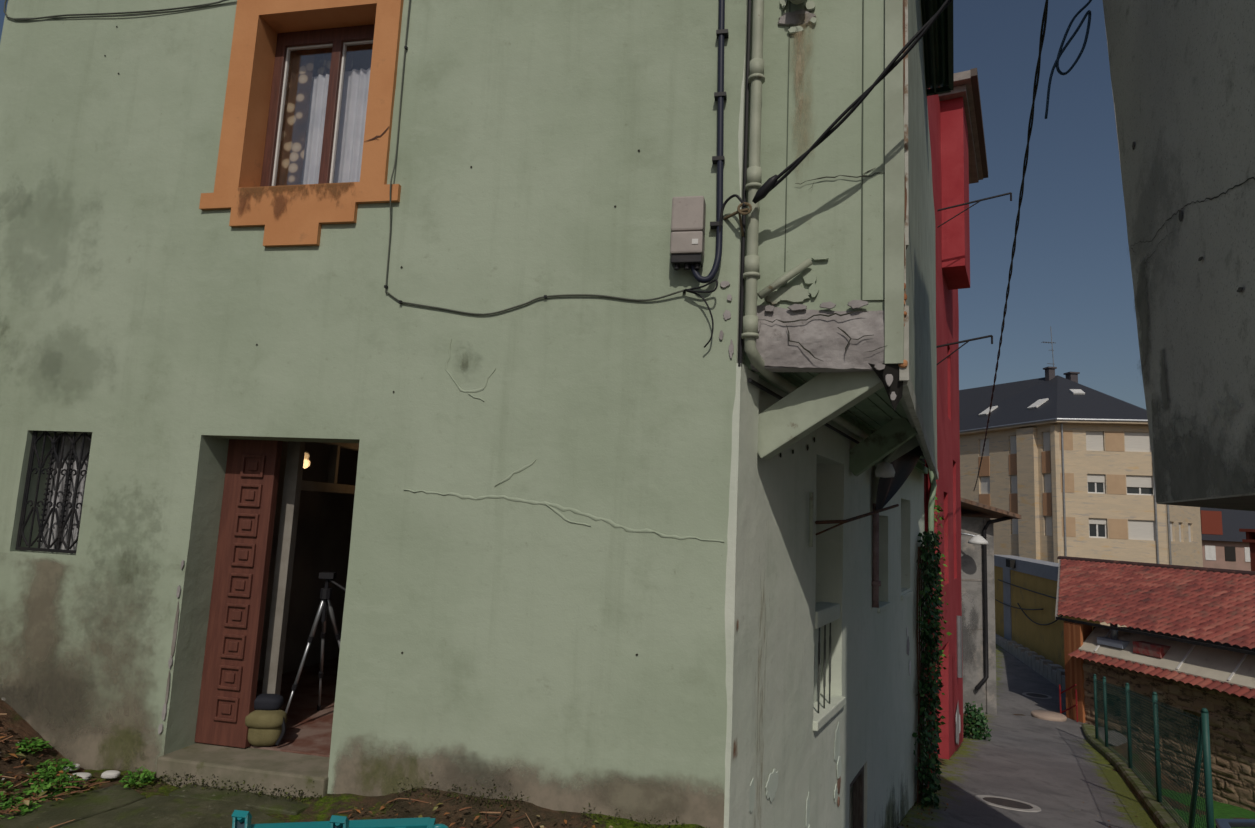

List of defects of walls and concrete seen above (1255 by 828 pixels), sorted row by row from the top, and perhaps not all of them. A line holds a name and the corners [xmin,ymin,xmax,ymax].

crack [1131,177,1255,265]
spalling [750,255,908,411]
leakage [1135,260,1149,382]
leakage [0,559,146,771]
leakage [333,742,725,828]